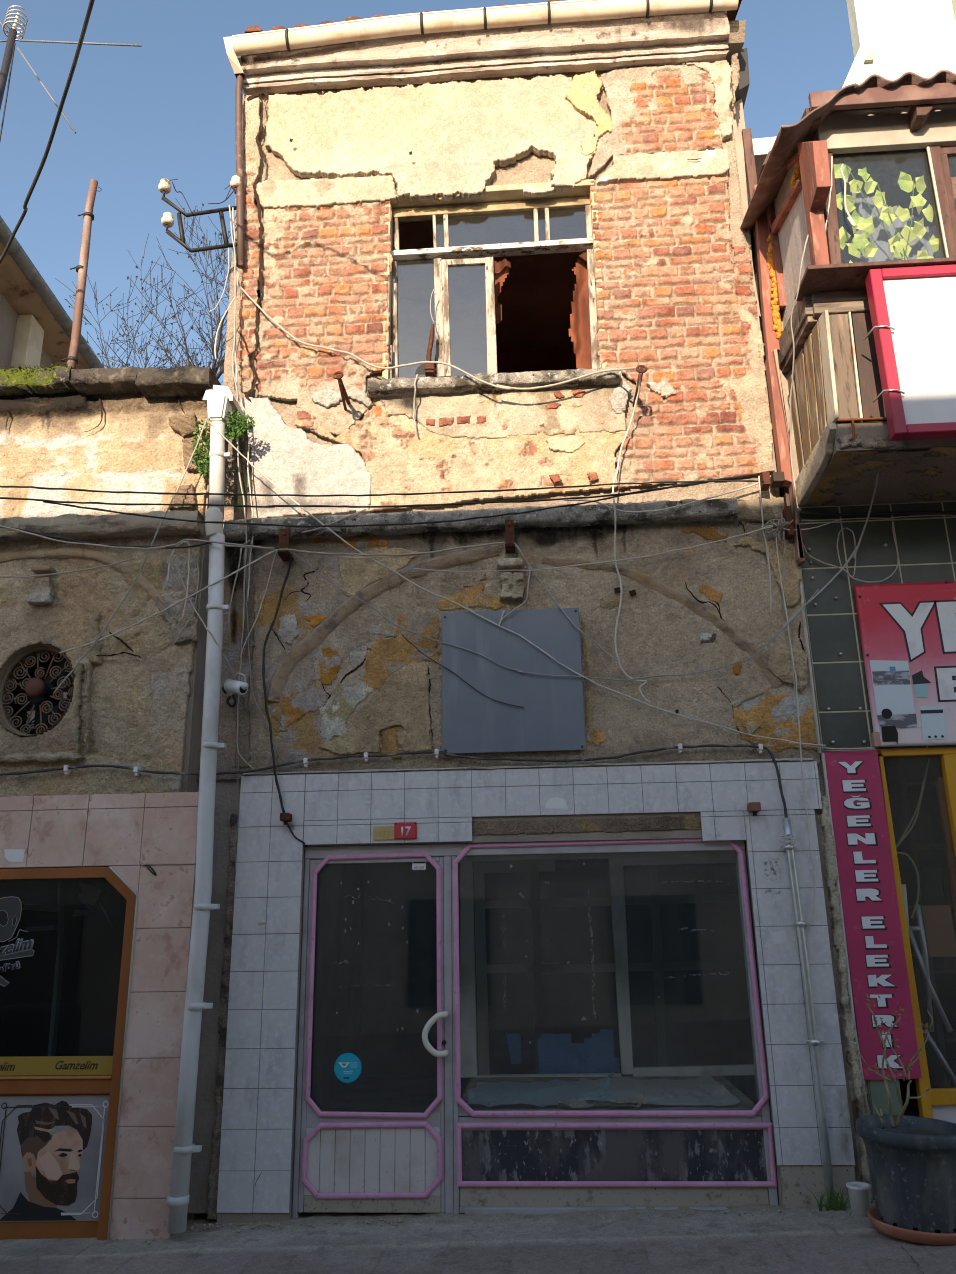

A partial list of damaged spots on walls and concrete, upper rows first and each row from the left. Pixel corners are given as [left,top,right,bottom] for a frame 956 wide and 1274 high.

crack [237,93,268,402]
spalling [237,64,775,512]
crack [286,568,318,601]
spalling [277,613,327,645]
spalling [307,535,419,598]
spalling [312,573,505,758]
peeling [731,643,818,753]